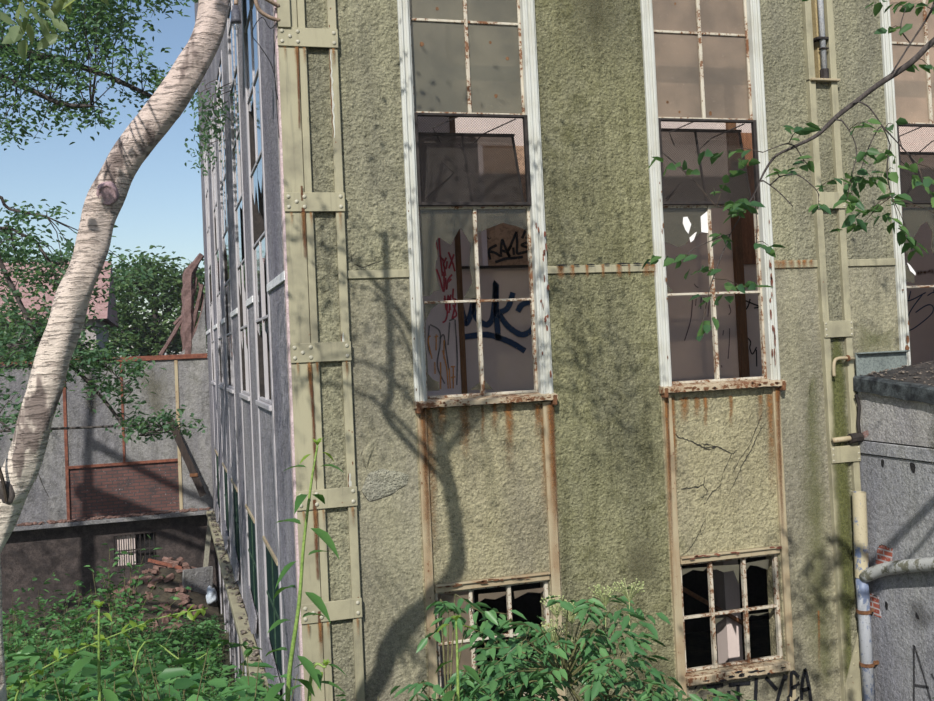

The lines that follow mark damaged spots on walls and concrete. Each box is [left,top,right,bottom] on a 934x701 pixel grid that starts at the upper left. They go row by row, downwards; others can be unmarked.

corrosion [284,46,305,127]
corrosion [290,186,312,256]
corrosion [297,362,318,476]
corrosion [481,403,512,432]
crack [675,415,765,552]
corrosion [303,500,324,579]
flaking render [876,544,893,565]